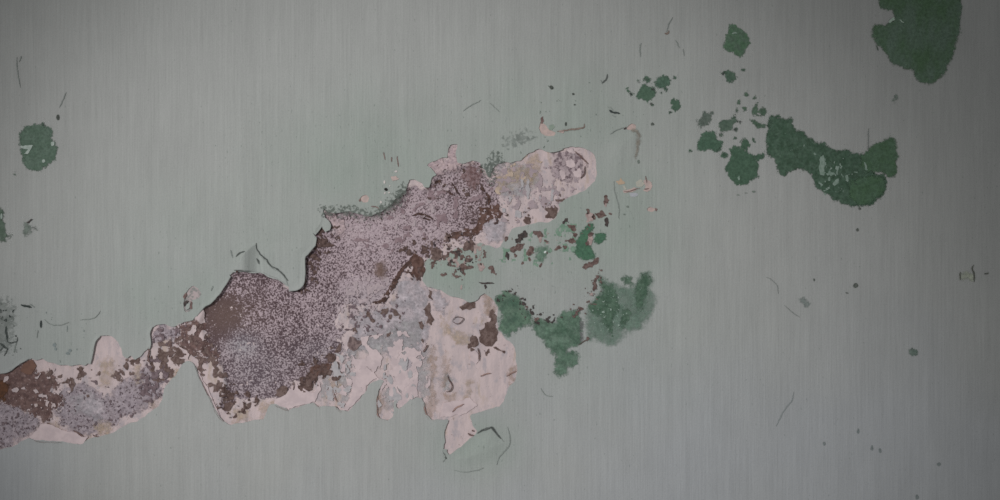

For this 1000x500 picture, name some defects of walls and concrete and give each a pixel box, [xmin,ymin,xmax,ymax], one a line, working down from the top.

peeling [0,144,612,458]
leakage [495,272,653,376]